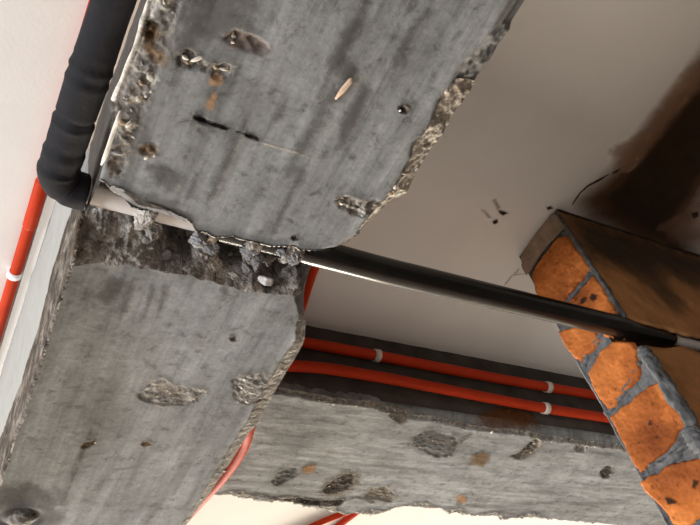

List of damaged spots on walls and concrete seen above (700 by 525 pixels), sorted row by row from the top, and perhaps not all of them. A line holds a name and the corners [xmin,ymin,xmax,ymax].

spalling [0,0,475,486]
crack [556,169,700,257]
water stain [583,62,700,254]
spalling [182,308,626,525]